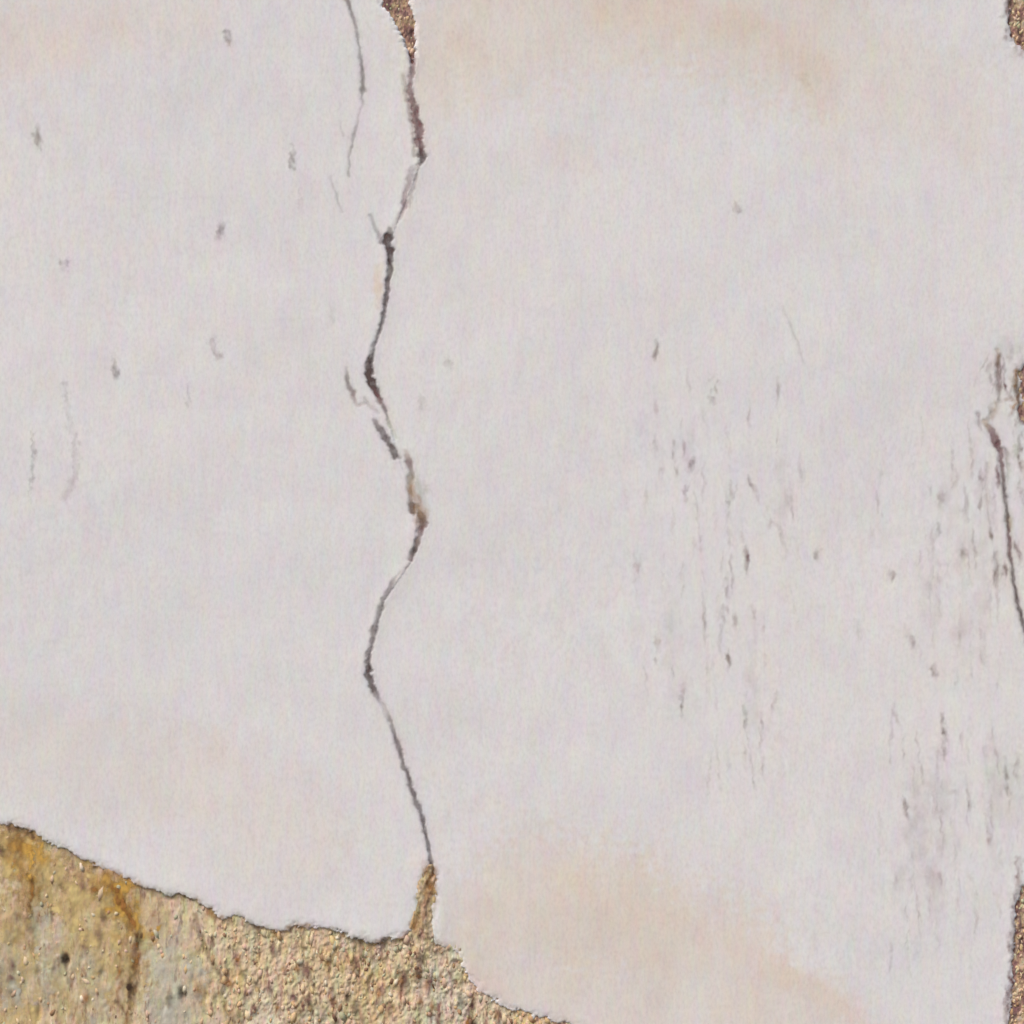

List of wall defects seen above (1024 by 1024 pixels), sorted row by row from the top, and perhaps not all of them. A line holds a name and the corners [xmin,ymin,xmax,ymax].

spalling [382,0,416,64]
spalling [1006,0,1024,50]
crack [408,58,426,163]
crack [382,233,395,315]
crack [365,355,411,465]
crack [409,503,425,556]
crack [990,429,1024,628]
crack [365,657,376,693]
crack [394,736,434,872]
spalling [0,823,570,1024]
spalling [1006,886,1024,1024]